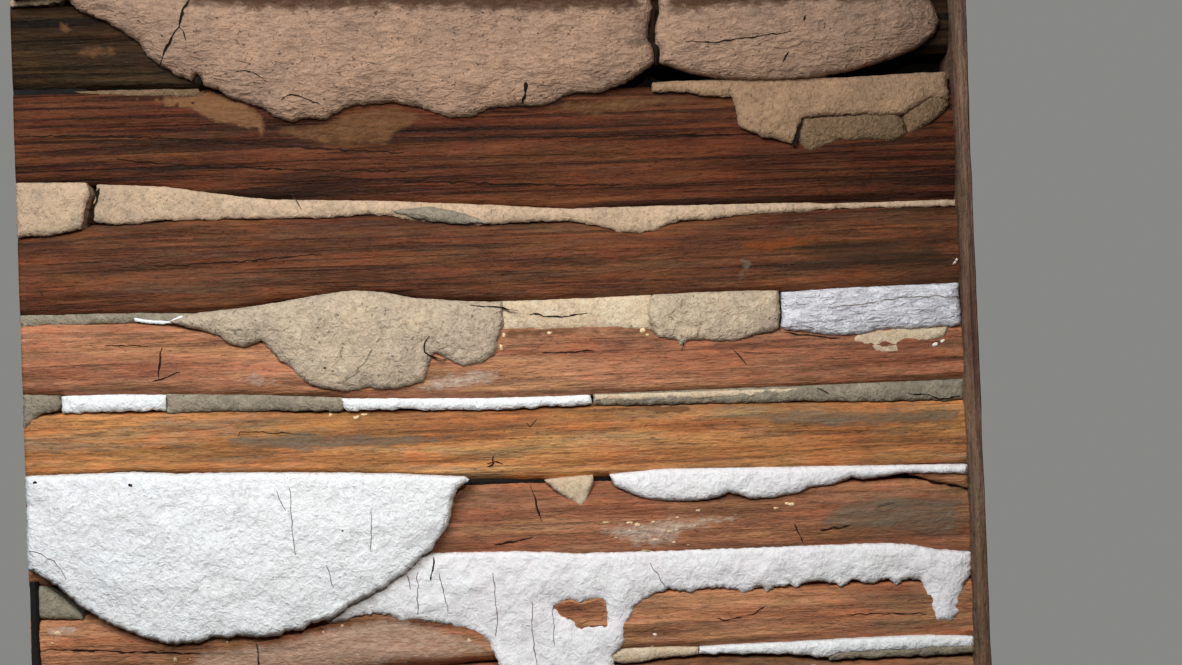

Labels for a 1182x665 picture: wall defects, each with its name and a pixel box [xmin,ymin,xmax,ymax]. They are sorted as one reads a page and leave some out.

crack [160,0,189,64]
crack [649,0,657,65]
crack [685,15,806,61]
flaking render [69,0,949,151]
peeling [171,291,506,391]
flaking render [640,283,961,351]
crack [496,485,542,545]
crack [407,557,448,615]
flaking render [25,464,971,665]
crack [531,603,555,663]